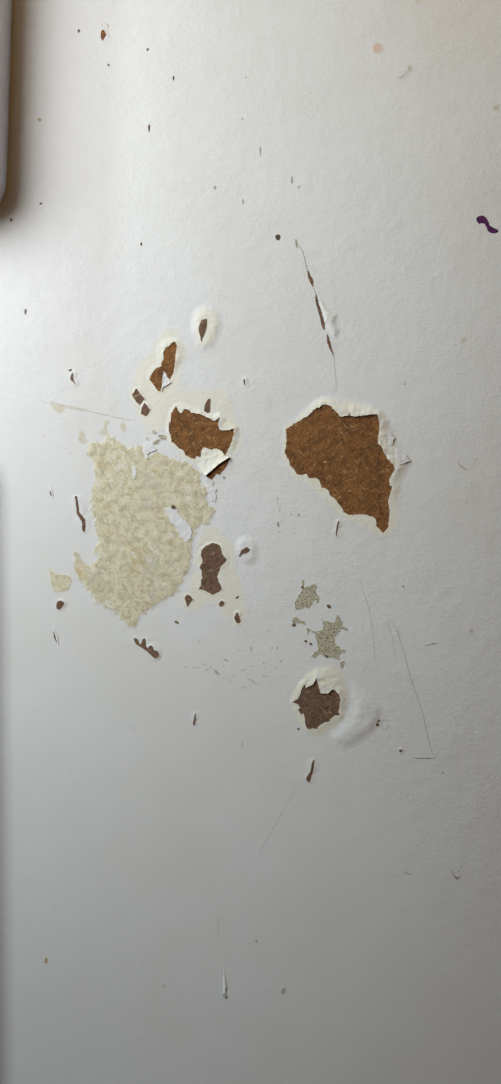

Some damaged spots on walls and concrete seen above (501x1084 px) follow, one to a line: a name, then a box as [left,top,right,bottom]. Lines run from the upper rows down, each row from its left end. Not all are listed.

peeling [68,370,80,387]
peeling [130,337,188,418]
crack [295,239,336,380]
peeling [48,399,244,662]
peeling [280,394,412,540]
peeling [289,579,349,738]